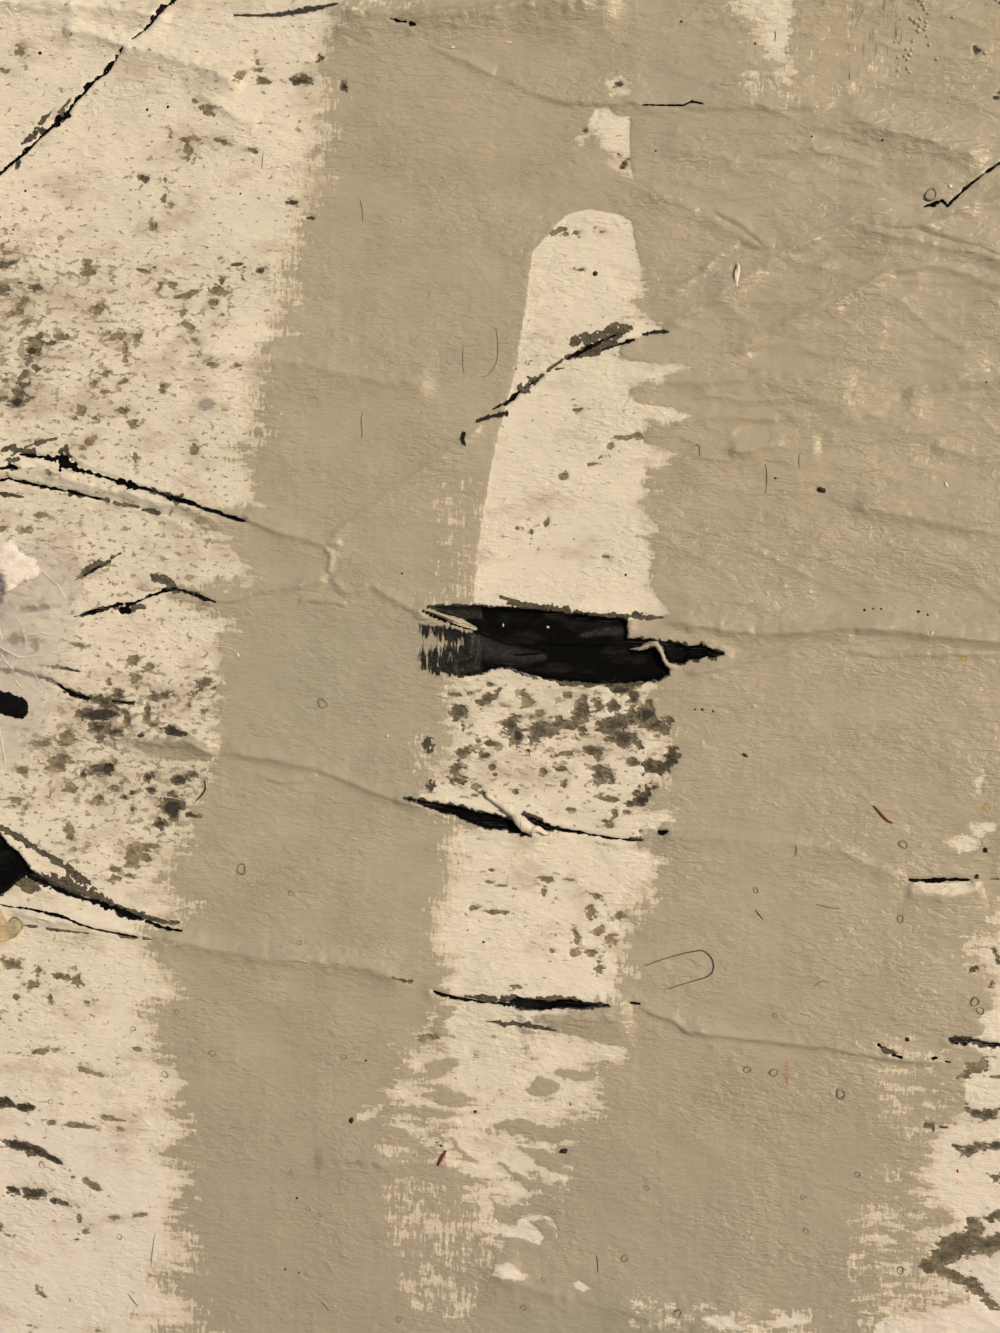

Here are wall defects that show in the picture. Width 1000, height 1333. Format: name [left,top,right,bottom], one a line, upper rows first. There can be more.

crack [0,0,177,175]
crack [924,162,1000,208]
crack [460,322,669,446]
crack [0,437,246,522]
peeling [19,604,49,612]
peeling [0,633,43,659]
peeling [988,947,1000,988]
peeling [956,1054,1000,1080]
peeling [963,1103,1000,1123]
peeling [923,1122,1000,1158]
peeling [917,1209,1000,1311]